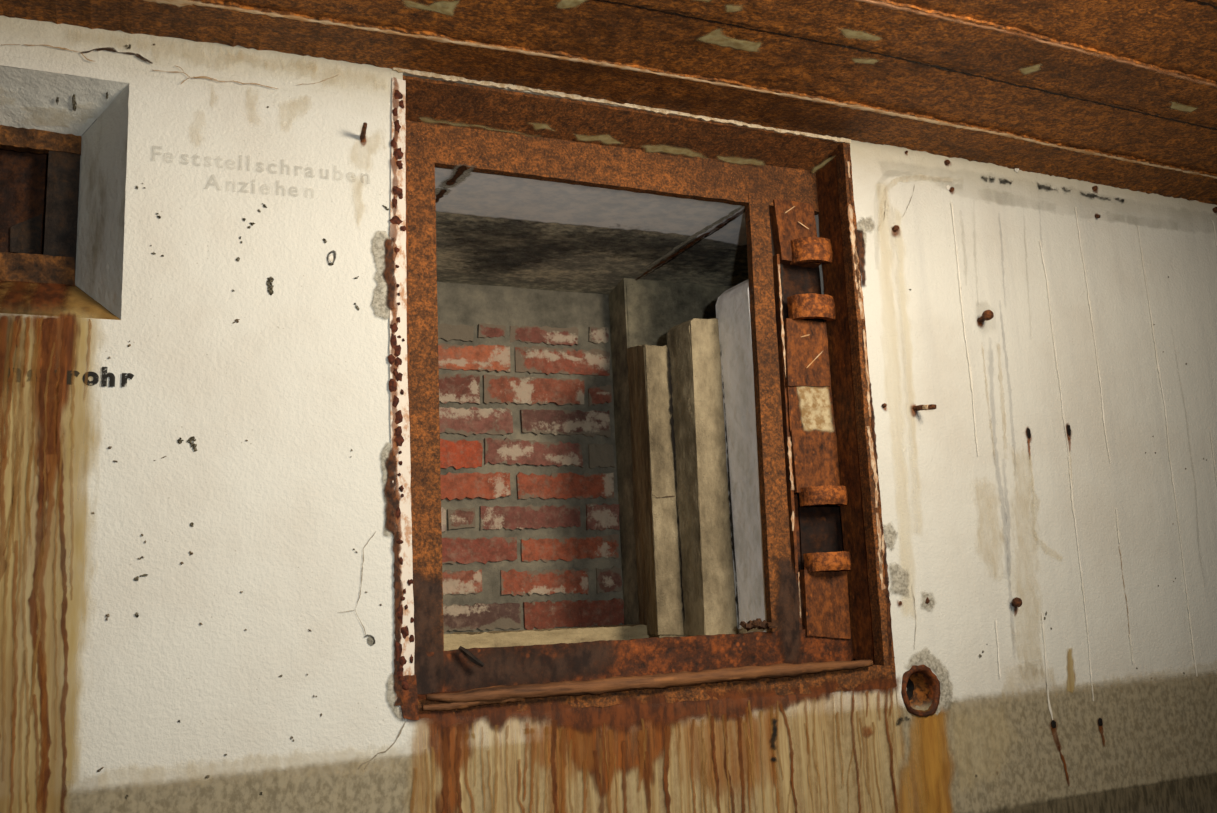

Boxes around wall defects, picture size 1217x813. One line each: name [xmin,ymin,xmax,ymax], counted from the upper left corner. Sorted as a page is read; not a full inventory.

crack [4,44,335,89]
corrosion [435,165,475,203]
corrosion [636,206,745,280]
water stain [1038,184,1124,462]
corrosion [867,382,886,490]
peeling [848,204,909,595]
water stain [1040,241,1094,698]
corrosion [0,280,94,813]
corrosion [880,523,899,664]
corrosion [410,678,952,813]
corrosion [1050,725,1069,785]